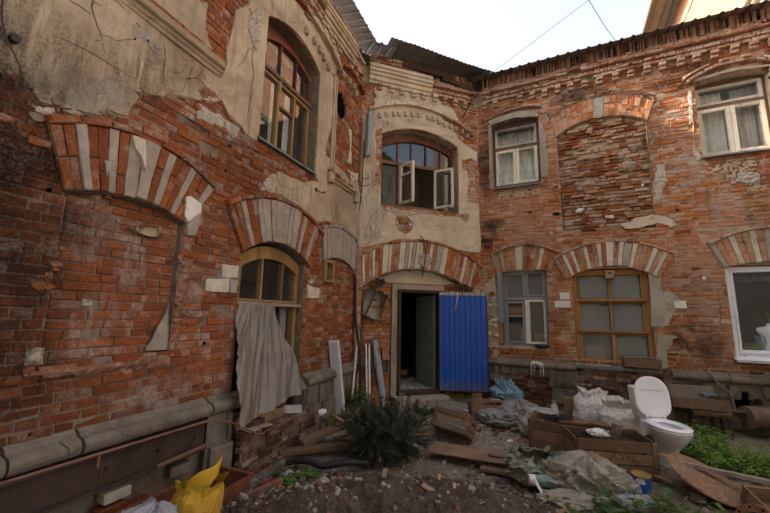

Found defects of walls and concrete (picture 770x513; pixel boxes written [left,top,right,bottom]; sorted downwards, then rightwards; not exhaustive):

crack [52,0,133,107]
crack [149,45,205,90]
spalling [198,75,223,104]
spalling [380,206,422,238]